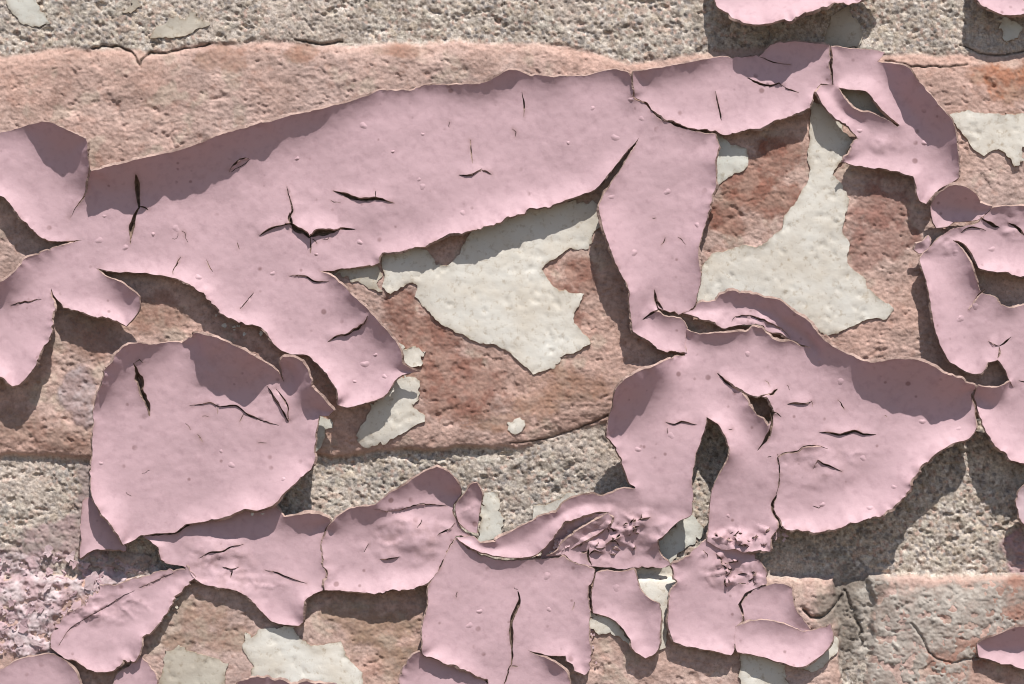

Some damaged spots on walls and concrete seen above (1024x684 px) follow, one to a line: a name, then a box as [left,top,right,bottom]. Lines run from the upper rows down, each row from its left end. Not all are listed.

peeling [631,40,992,228]
crack [129,174,147,238]
crack [261,189,355,246]
crack [331,192,386,202]
crack [133,359,150,416]
crack [197,388,289,443]
peeling [0,68,801,684]
peeling [320,182,1024,684]
crack [504,588,521,683]